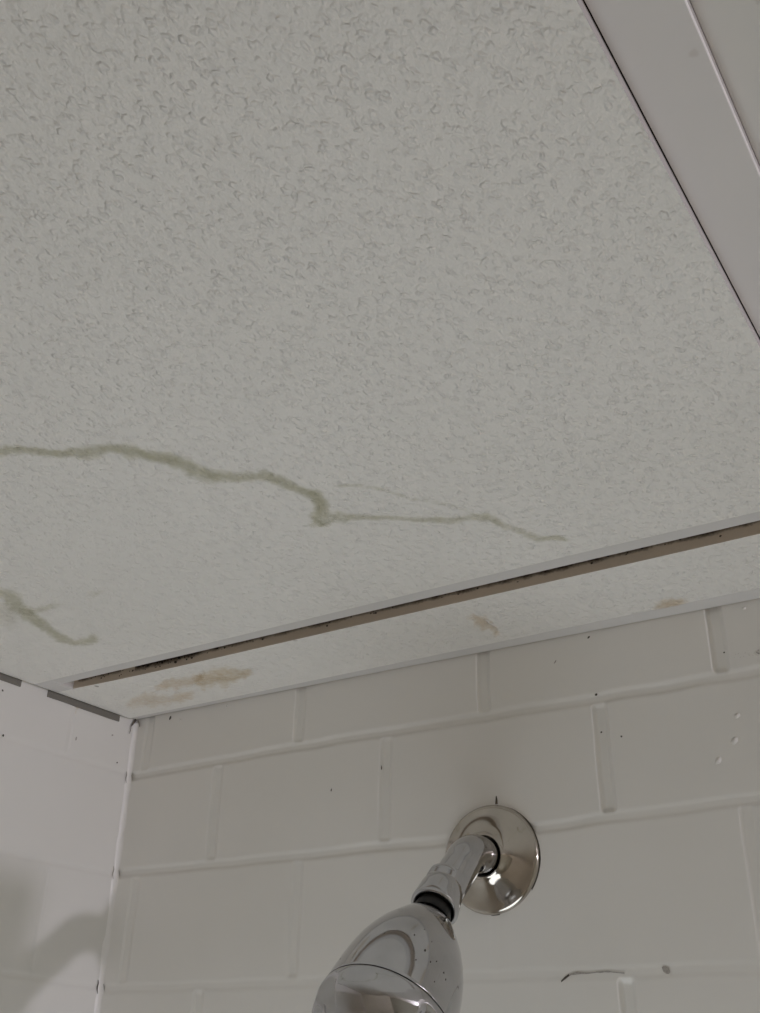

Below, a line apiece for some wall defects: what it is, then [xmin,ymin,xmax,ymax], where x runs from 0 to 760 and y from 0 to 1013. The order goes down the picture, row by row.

water stain [365,520,760,614]
water stain [79,616,352,681]